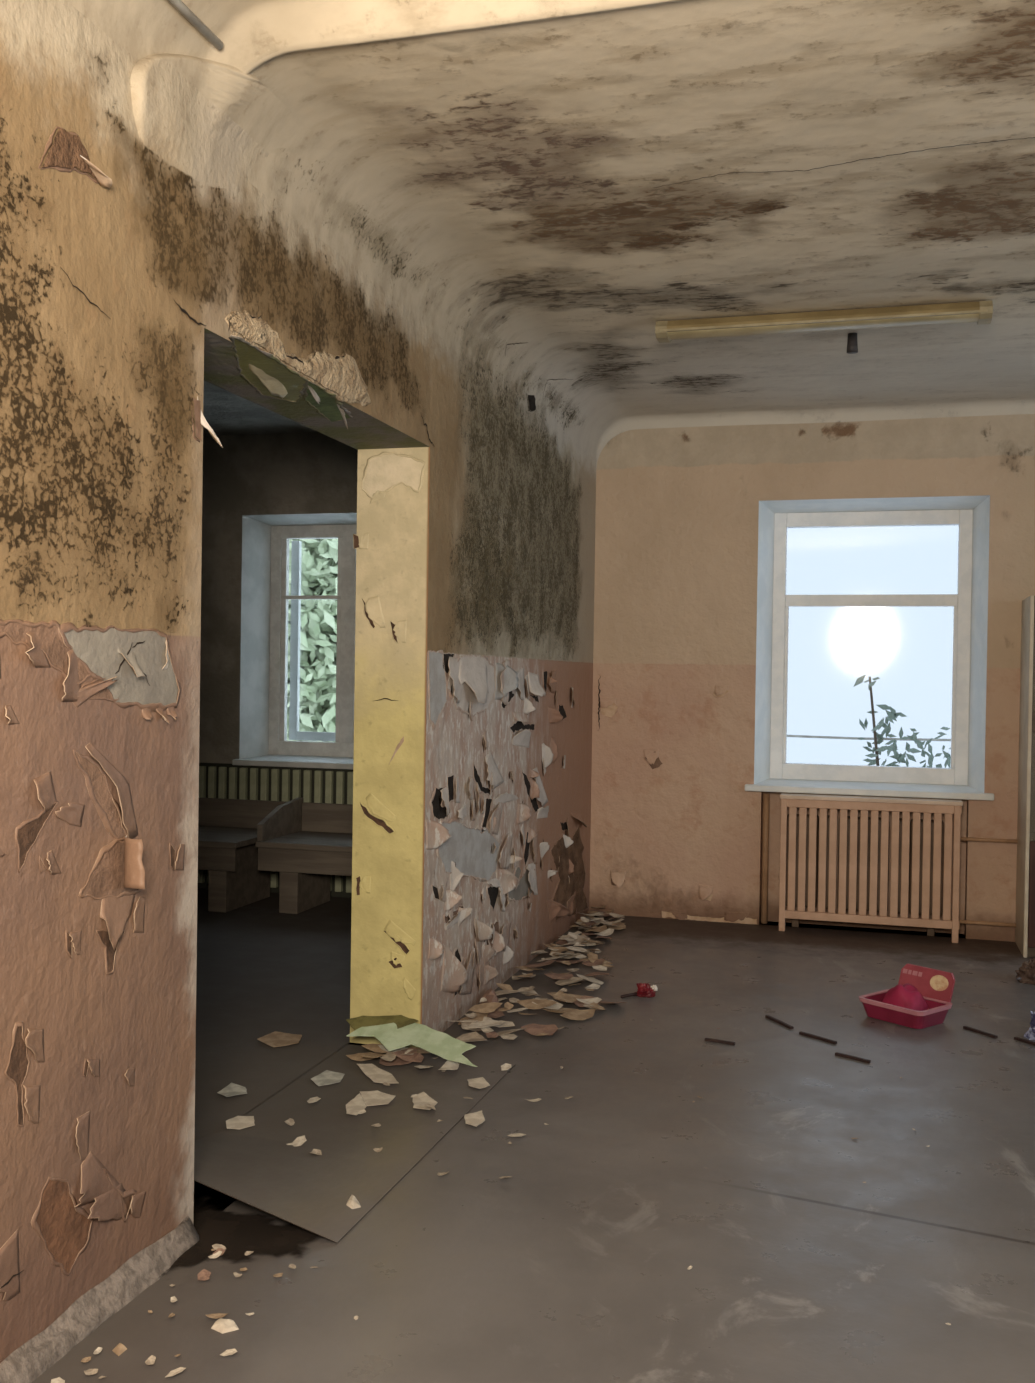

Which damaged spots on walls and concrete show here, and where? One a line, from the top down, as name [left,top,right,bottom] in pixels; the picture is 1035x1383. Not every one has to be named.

leakage [941,0,1035,94]
leakage [108,112,421,410]
leakage [400,94,786,252]
leakage [894,154,1035,242]
leakage [0,118,197,629]
leakage [447,344,650,655]
flaking render [0,619,181,725]
peeling [0,743,146,975]
peeling [383,650,588,1000]
peeling [5,1022,44,1127]
peeling [0,1111,146,1300]
peeling [81,1347,105,1379]